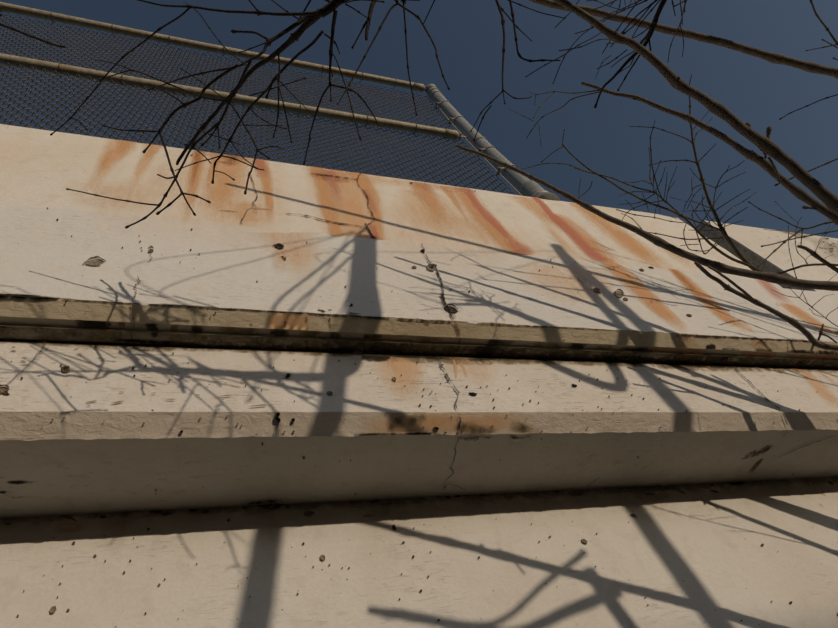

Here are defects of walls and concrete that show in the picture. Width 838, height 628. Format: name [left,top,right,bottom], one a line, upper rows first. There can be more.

corrosion [99,139,133,172]
corrosion [189,150,273,219]
crack [287,173,375,238]
corrosion [310,166,383,239]
corrosion [441,186,530,255]
corrosion [518,196,679,323]
corrosion [670,269,736,324]
water stain [0,312,838,382]
crack [422,243,463,489]